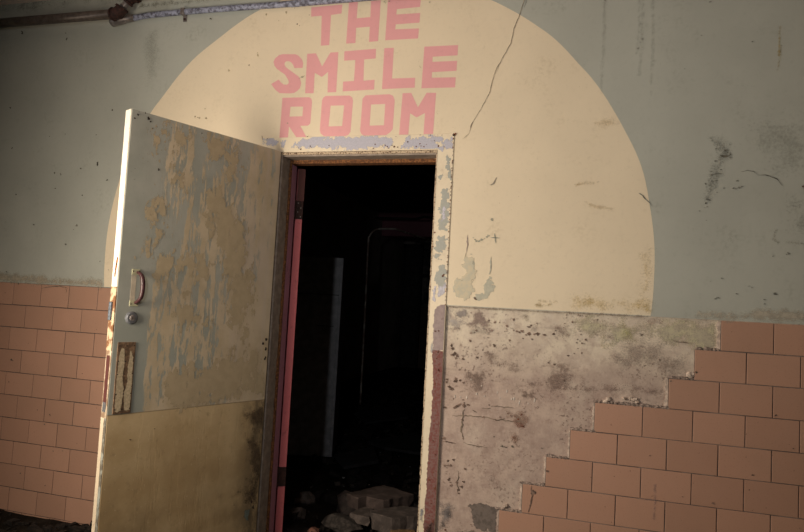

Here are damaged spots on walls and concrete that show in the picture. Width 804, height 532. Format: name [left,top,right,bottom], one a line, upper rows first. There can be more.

crack [464,1,526,138]
spalling [263,135,802,532]